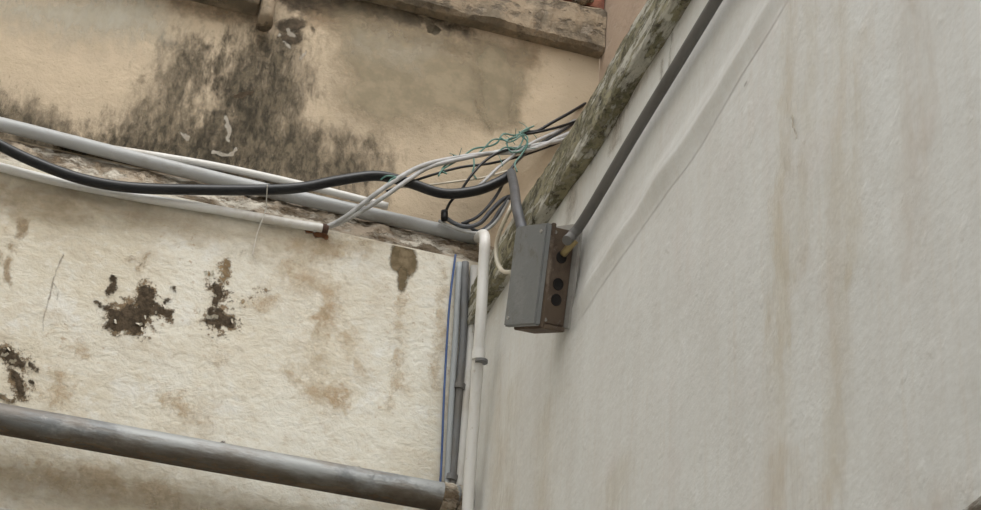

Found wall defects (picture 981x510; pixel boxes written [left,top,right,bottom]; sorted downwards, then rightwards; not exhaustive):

damp [313,11,537,124]
damp [0,31,382,196]
spalling [93,274,176,342]
spalling [200,258,242,338]
spalling [0,340,39,403]